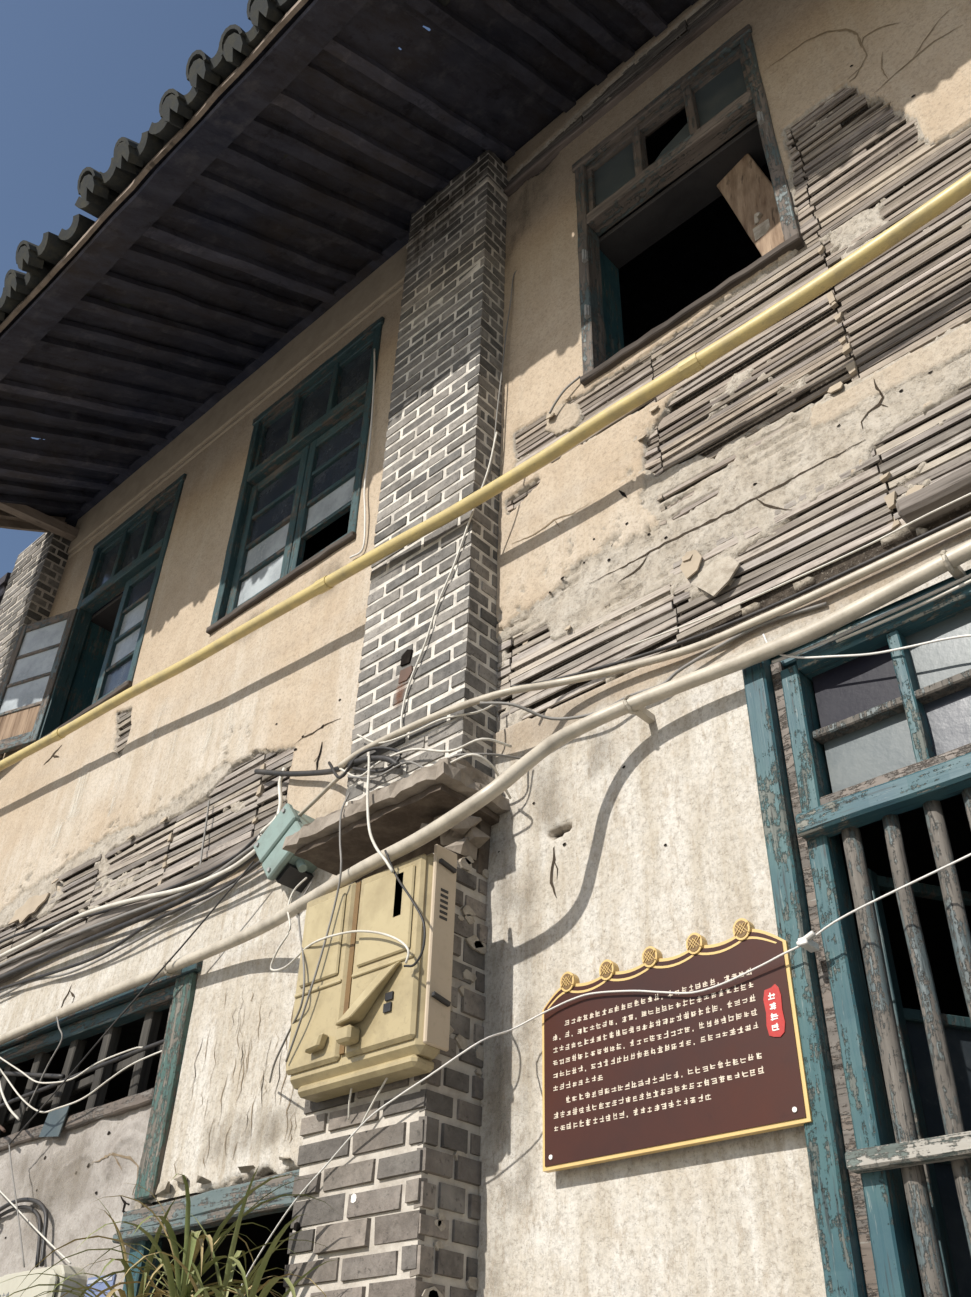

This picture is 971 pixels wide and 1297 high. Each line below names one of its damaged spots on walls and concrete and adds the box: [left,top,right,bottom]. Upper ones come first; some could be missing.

crack [769,11,962,93]
flaking render [493,65,971,740]
crack [589,380,888,584]
crack [512,503,589,544]
flaking render [110,701,137,763]
flaking render [0,723,304,964]
crack [550,846,558,898]
flaking render [125,1143,303,1211]